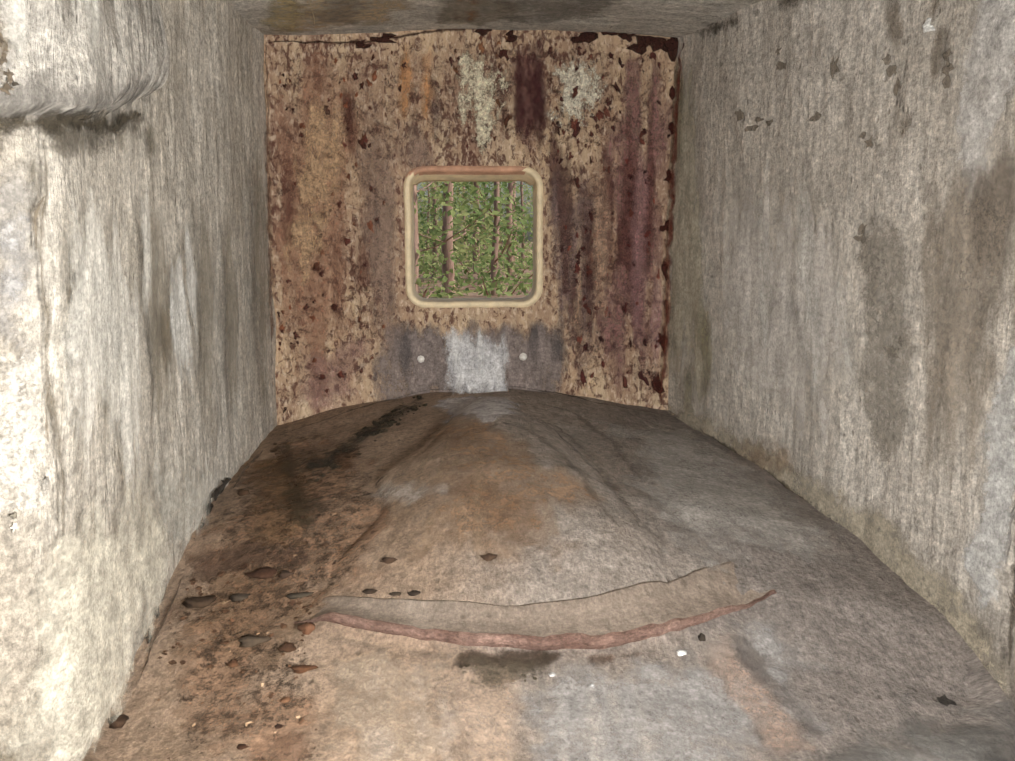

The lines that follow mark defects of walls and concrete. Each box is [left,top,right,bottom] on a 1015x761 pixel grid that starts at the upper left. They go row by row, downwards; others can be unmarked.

rust [265,39,684,405]
water stain [437,333,640,527]
water stain [541,70,993,668]
water stain [924,0,1015,437]
water stain [965,347,1015,603]
crack [1005,508,1015,666]